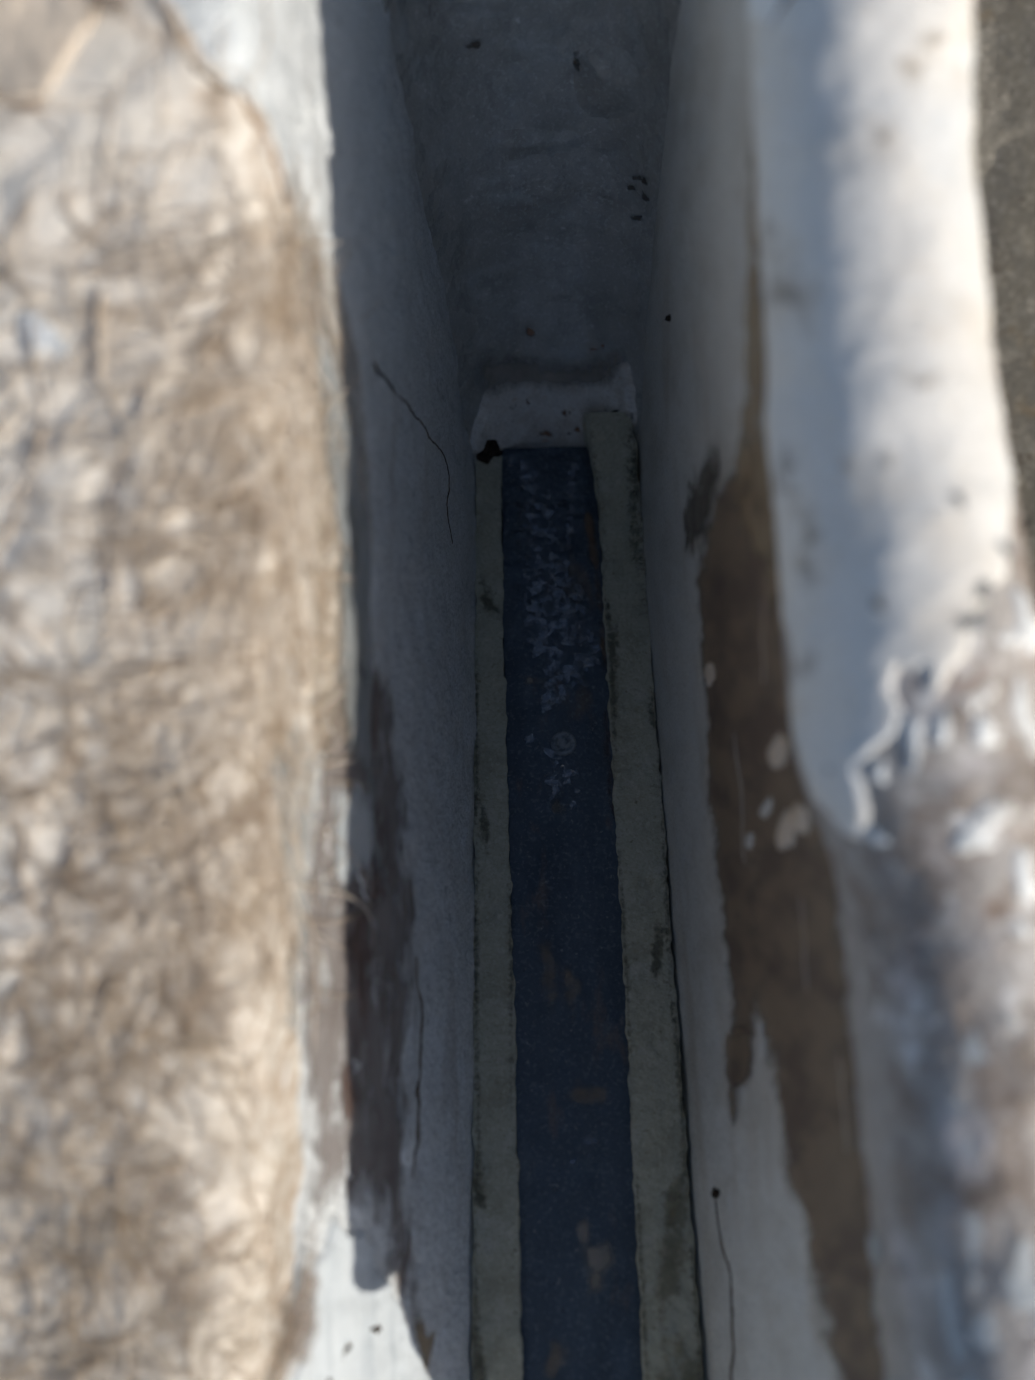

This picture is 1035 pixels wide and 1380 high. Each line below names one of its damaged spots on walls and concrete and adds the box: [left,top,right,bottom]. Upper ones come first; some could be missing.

crack [373,362,453,544]
peeling [747,0,1035,854]
damp [301,668,415,1301]
damp [696,474,886,1380]
peeling [1012,847,1035,902]
crack [711,1186,735,1380]
peeling [940,1271,1000,1380]
peeling [1006,1237,1035,1312]